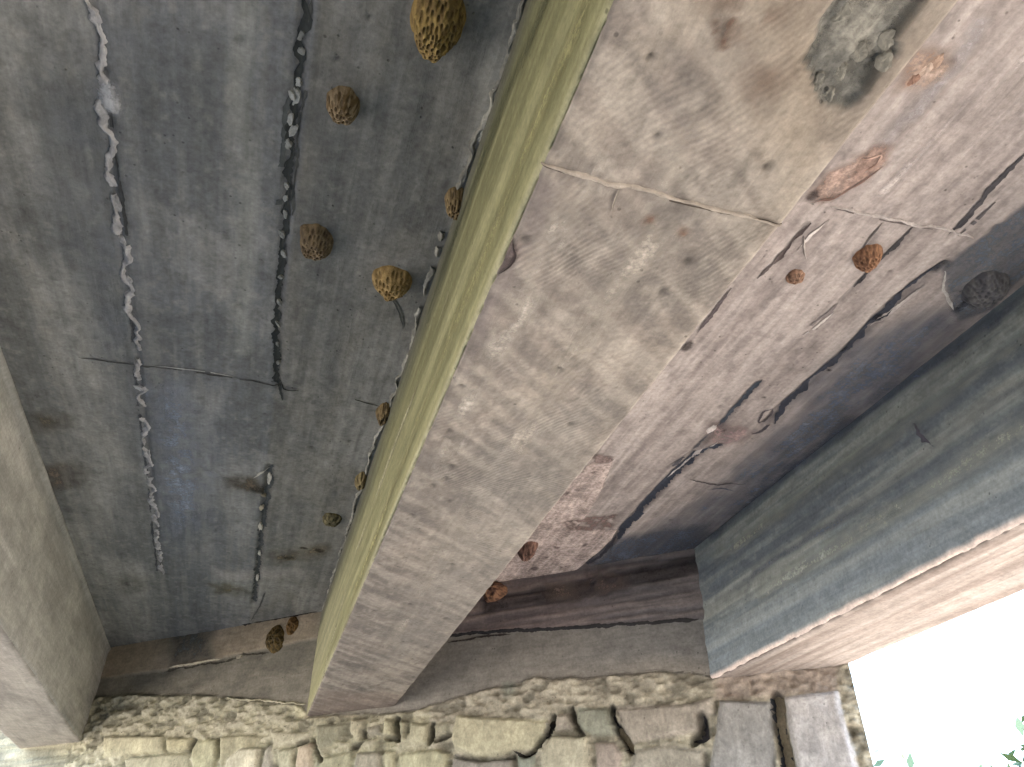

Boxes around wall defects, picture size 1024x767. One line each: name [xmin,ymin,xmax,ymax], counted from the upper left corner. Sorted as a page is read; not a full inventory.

crack [83,0,313,575]
crack [541,155,1024,336]
crack [586,260,945,564]
crack [242,465,314,626]
crack [448,618,699,643]